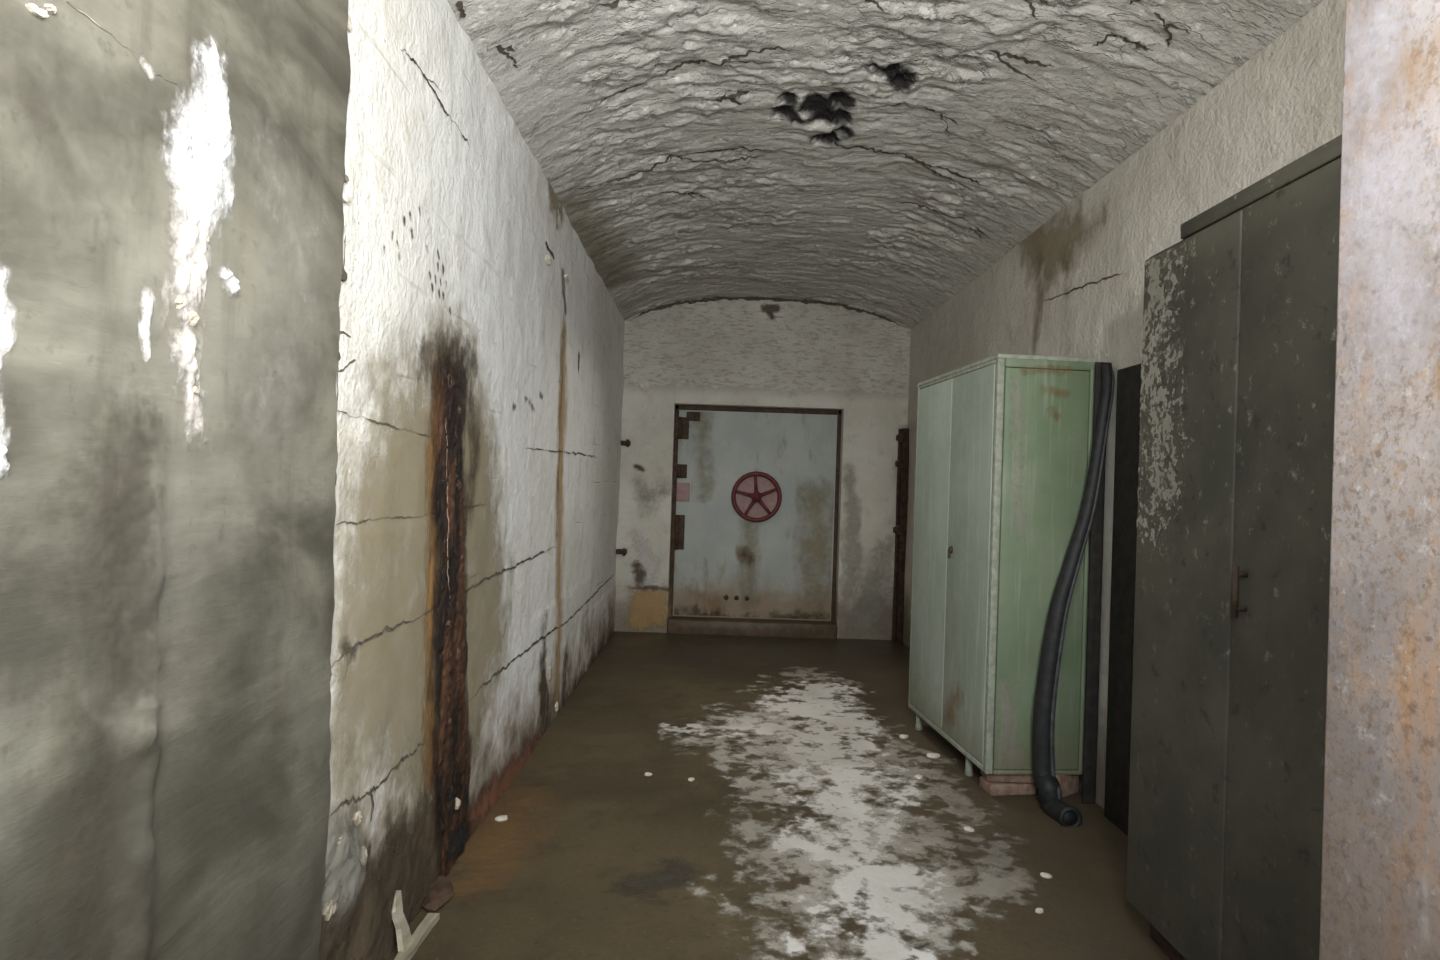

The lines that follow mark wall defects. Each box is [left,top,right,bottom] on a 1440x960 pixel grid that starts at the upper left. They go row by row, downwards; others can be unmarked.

crack [401,49,469,145]
crack [482,43,518,68]
crack [591,0,635,11]
crack [591,46,791,109]
crack [952,49,1054,81]
crack [1025,0,1048,19]
crack [1092,0,1191,59]
crack [573,146,769,208]
crack [836,144,991,239]
crack [1043,273,1120,301]
water stain [658,667,1030,960]
water stain [319,793,443,960]